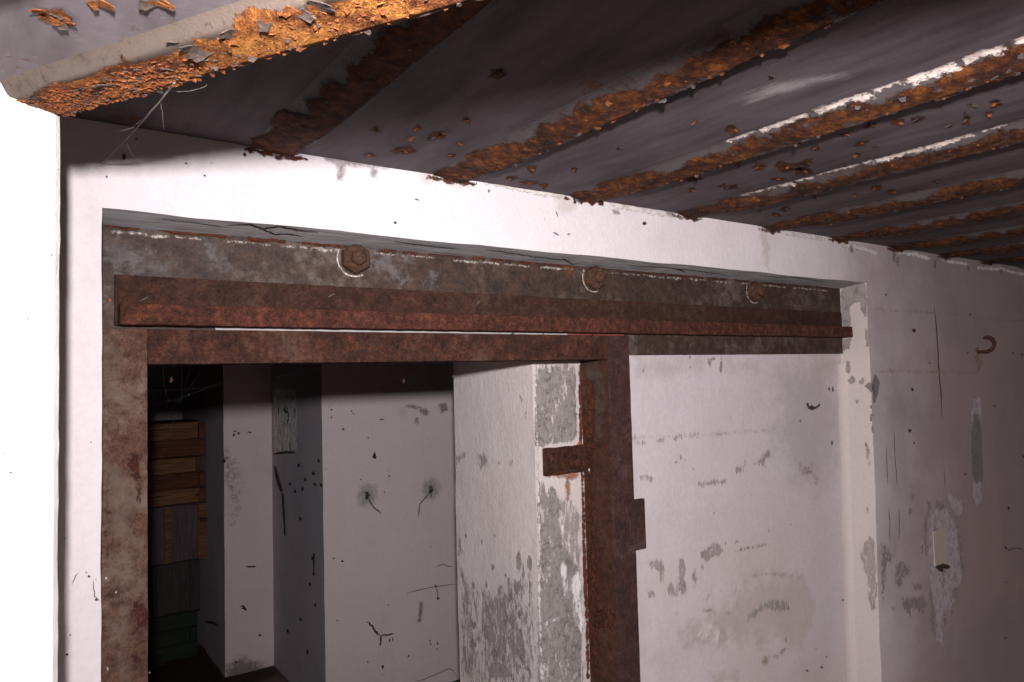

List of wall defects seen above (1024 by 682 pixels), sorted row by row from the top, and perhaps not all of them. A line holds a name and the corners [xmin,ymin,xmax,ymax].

rust [159,230,227,239]
crack [165,219,318,236]
rust [26,0,496,161]
rust [247,236,286,244]
rust [380,249,829,289]
rust [390,0,885,189]
rust [565,44,1024,266]
peeling [840,283,880,450]
rust [128,455,141,501]
spalling [461,364,583,682]
rust [549,364,617,679]